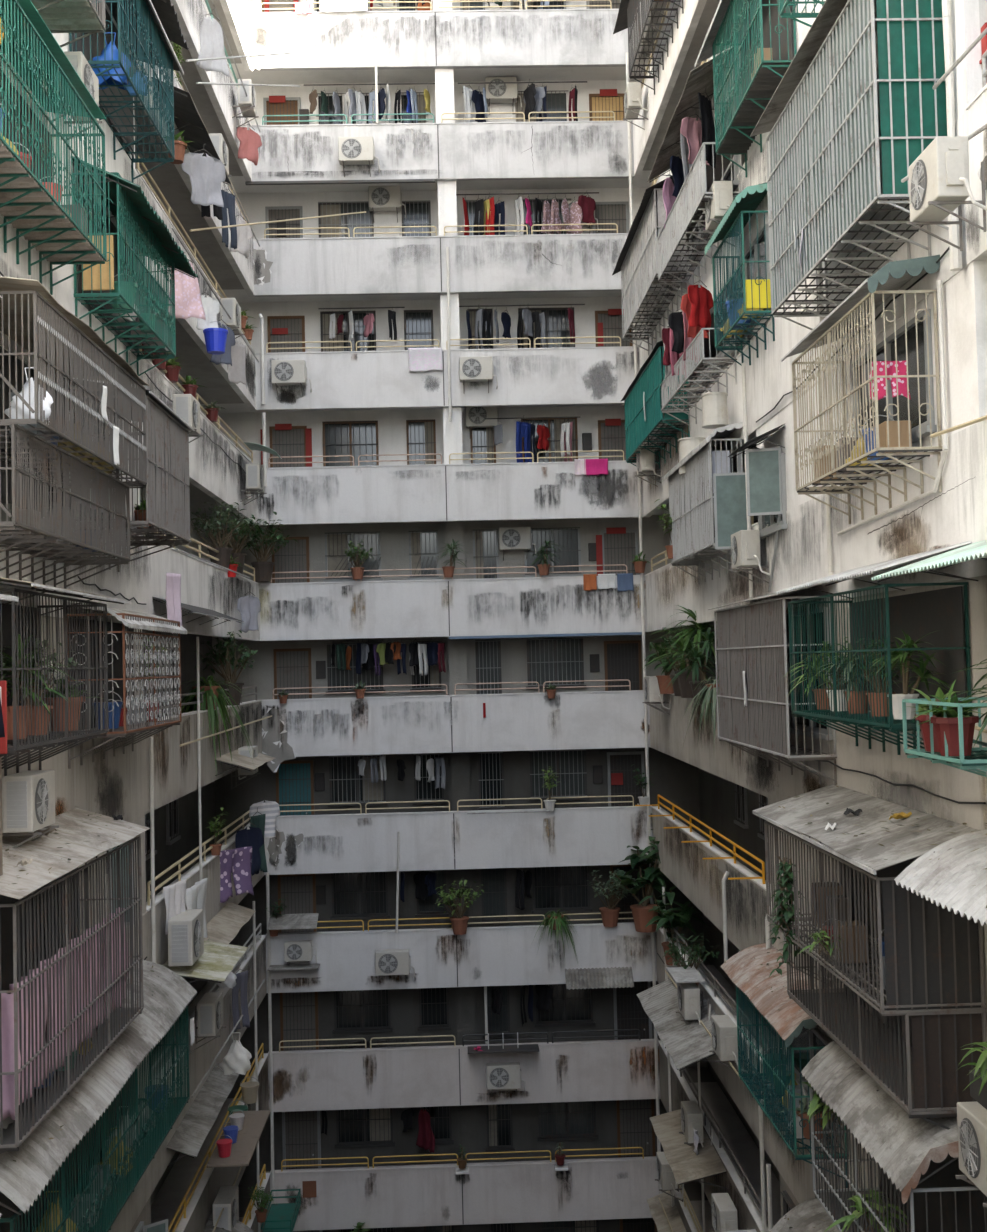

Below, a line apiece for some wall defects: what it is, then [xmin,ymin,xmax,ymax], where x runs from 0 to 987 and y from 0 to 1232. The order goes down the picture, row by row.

damp [385,16,485,48]
damp [583,361,617,399]
damp [535,470,628,507]
damp [520,591,559,618]
damp [577,585,636,616]
damp [210,700,367,748]
damp [274,832,309,865]
rust [630,1047,660,1080]
rust [268,1071,295,1103]